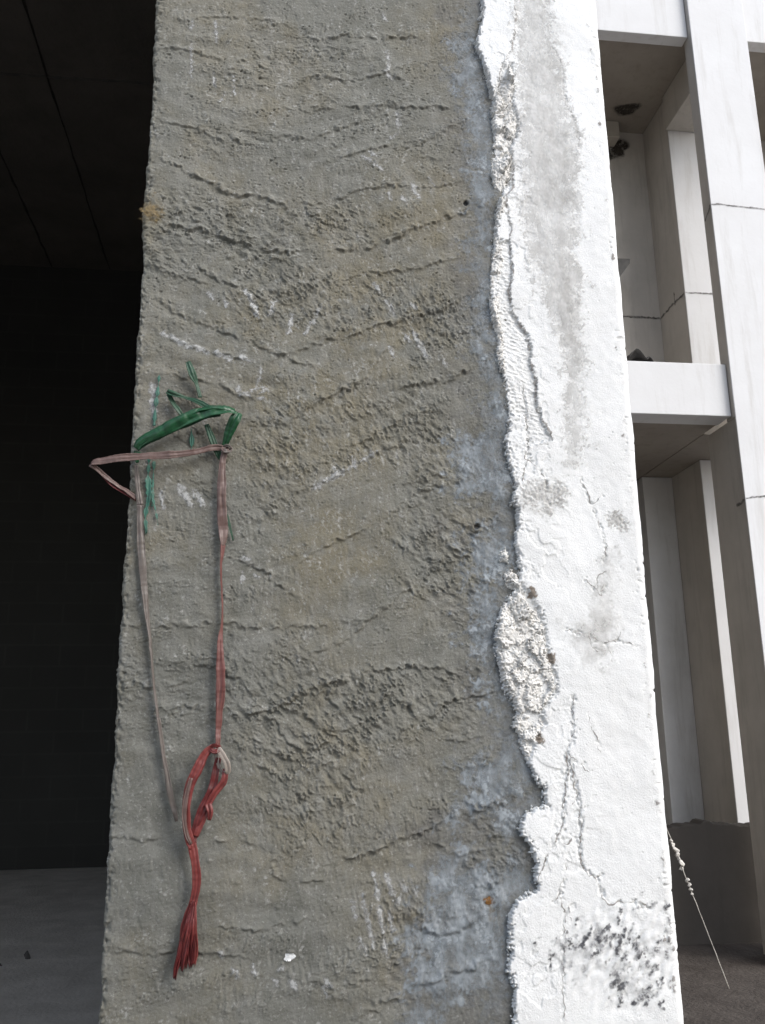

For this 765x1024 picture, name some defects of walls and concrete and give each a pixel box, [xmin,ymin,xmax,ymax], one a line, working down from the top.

peeling [488,0,596,469]
peeling [177,341,251,362]
peeling [287,306,323,335]
damp [438,33,518,718]
peeling [177,483,205,506]
peeling [329,450,378,480]
spalling [492,547,556,761]
peeling [352,873,417,956]
damp [393,736,543,1024]
crack [538,696,646,1016]
damp [549,903,671,1010]